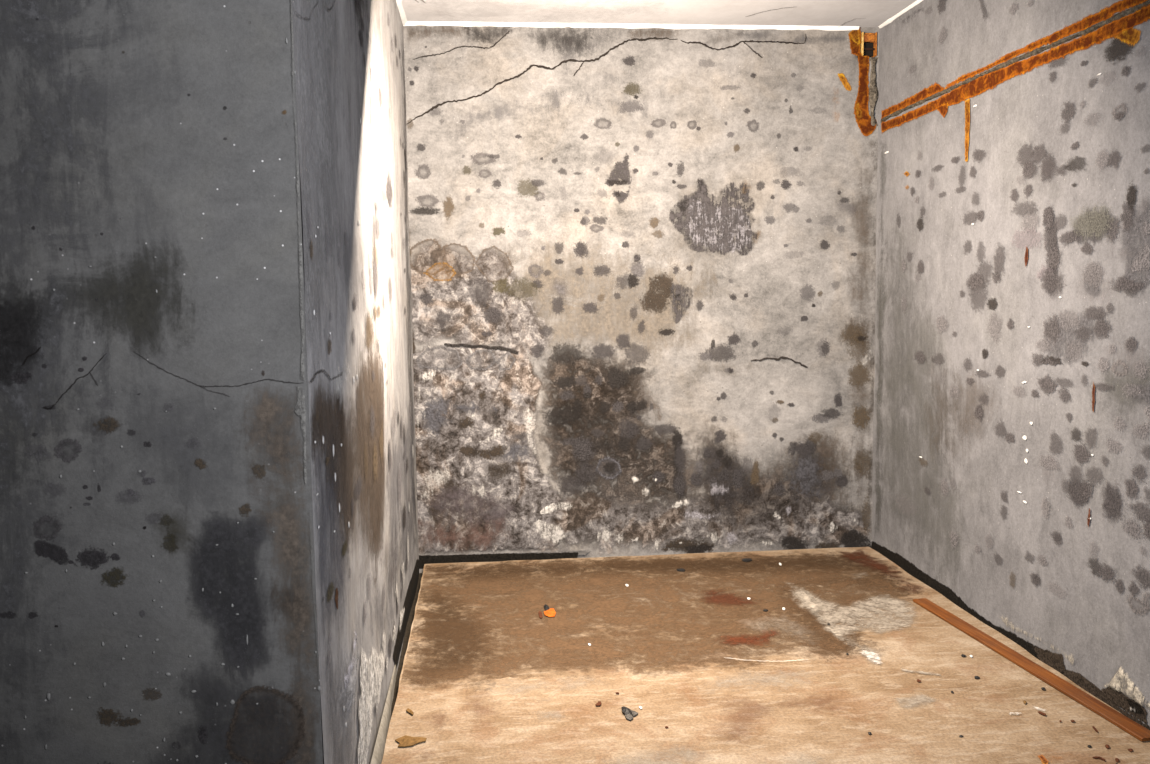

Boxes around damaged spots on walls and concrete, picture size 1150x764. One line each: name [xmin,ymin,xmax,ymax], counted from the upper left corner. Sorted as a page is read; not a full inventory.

water stain [474,28,507,42]
water stain [539,29,587,49]
crack [407,31,807,124]
rust [838,0,1150,161]
water stain [1105,38,1133,76]
water stain [581,82,642,140]
crack [56,353,107,403]
crack [310,369,331,383]
flaking render [412,330,570,554]
water stain [313,99,1150,764]
water stain [169,495,315,764]
water stain [98,707,141,727]